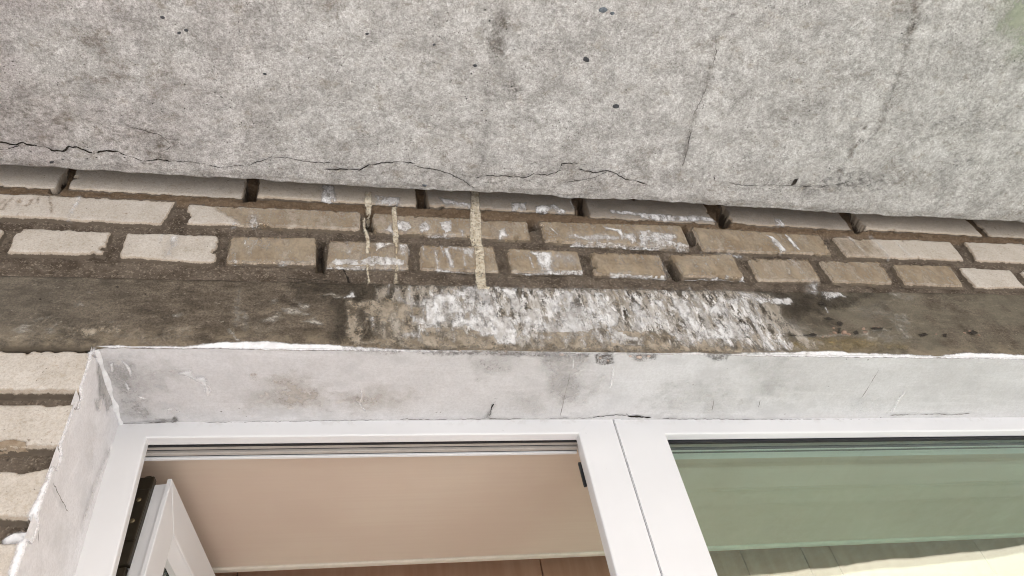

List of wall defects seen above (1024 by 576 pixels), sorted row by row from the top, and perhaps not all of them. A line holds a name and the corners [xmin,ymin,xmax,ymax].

crack [0,127,645,188]
crack [682,41,717,166]
damp [216,185,962,398]